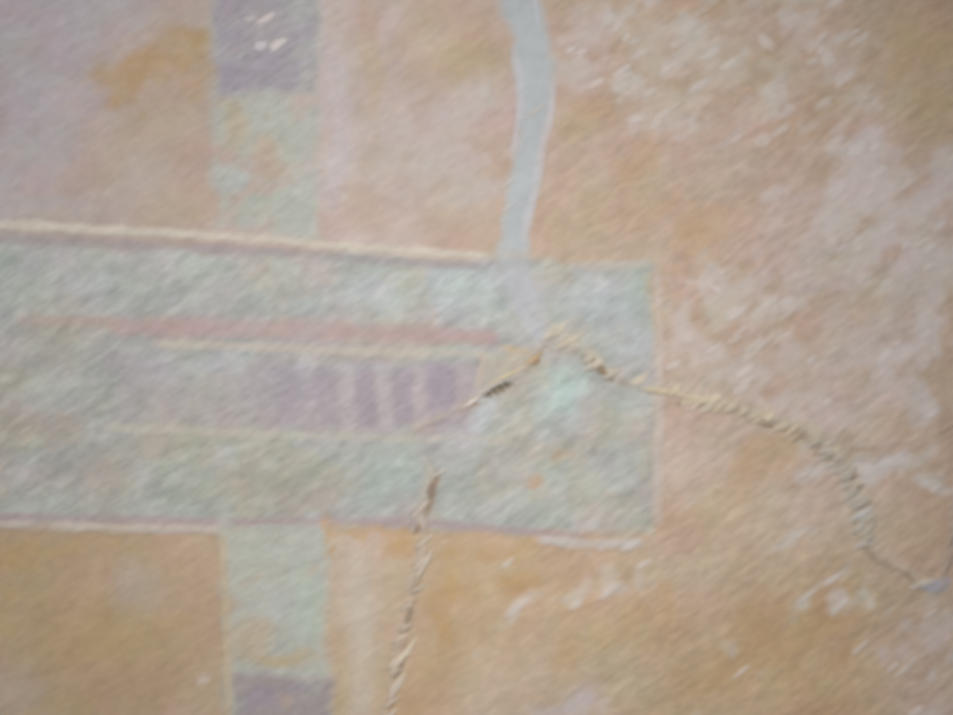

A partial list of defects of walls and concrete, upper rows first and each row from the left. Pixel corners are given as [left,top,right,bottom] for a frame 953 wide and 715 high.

crack [374,0,953,715]